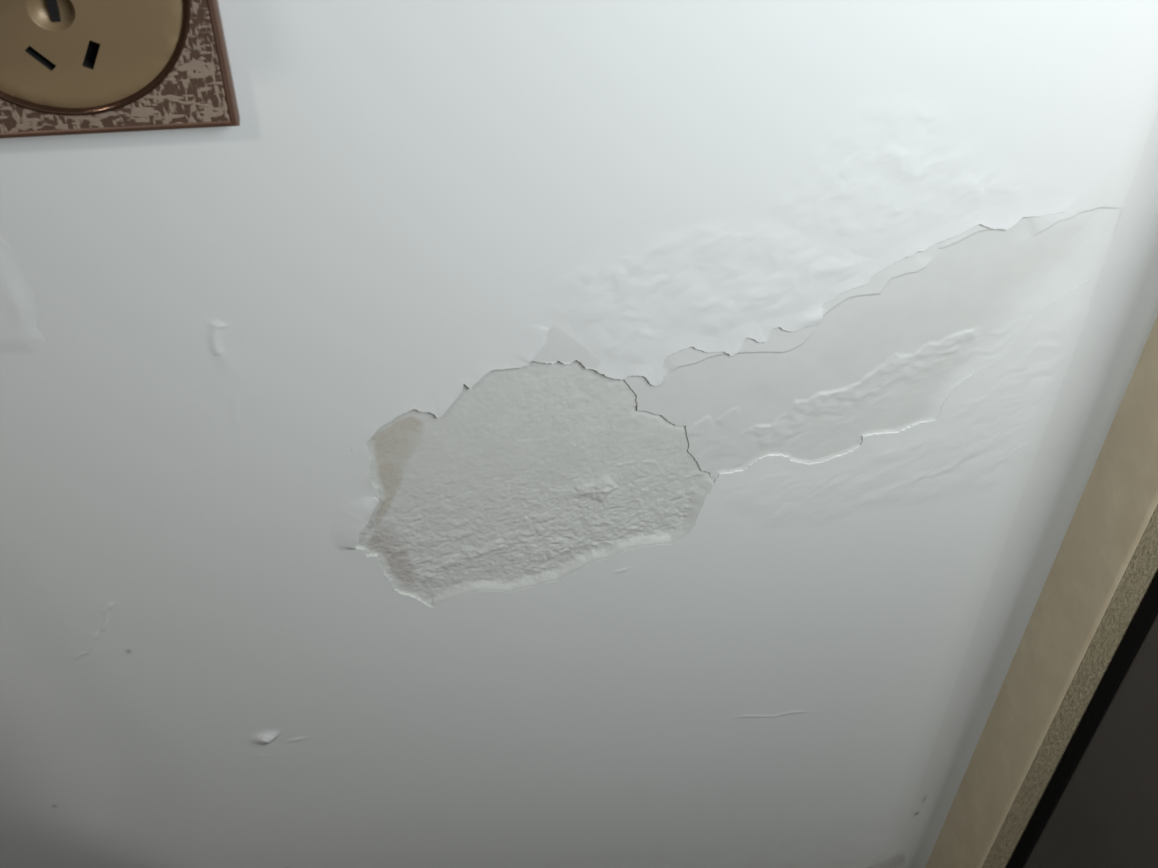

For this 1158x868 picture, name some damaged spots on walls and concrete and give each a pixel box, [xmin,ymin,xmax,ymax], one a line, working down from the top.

flaking render [330,165,1128,610]